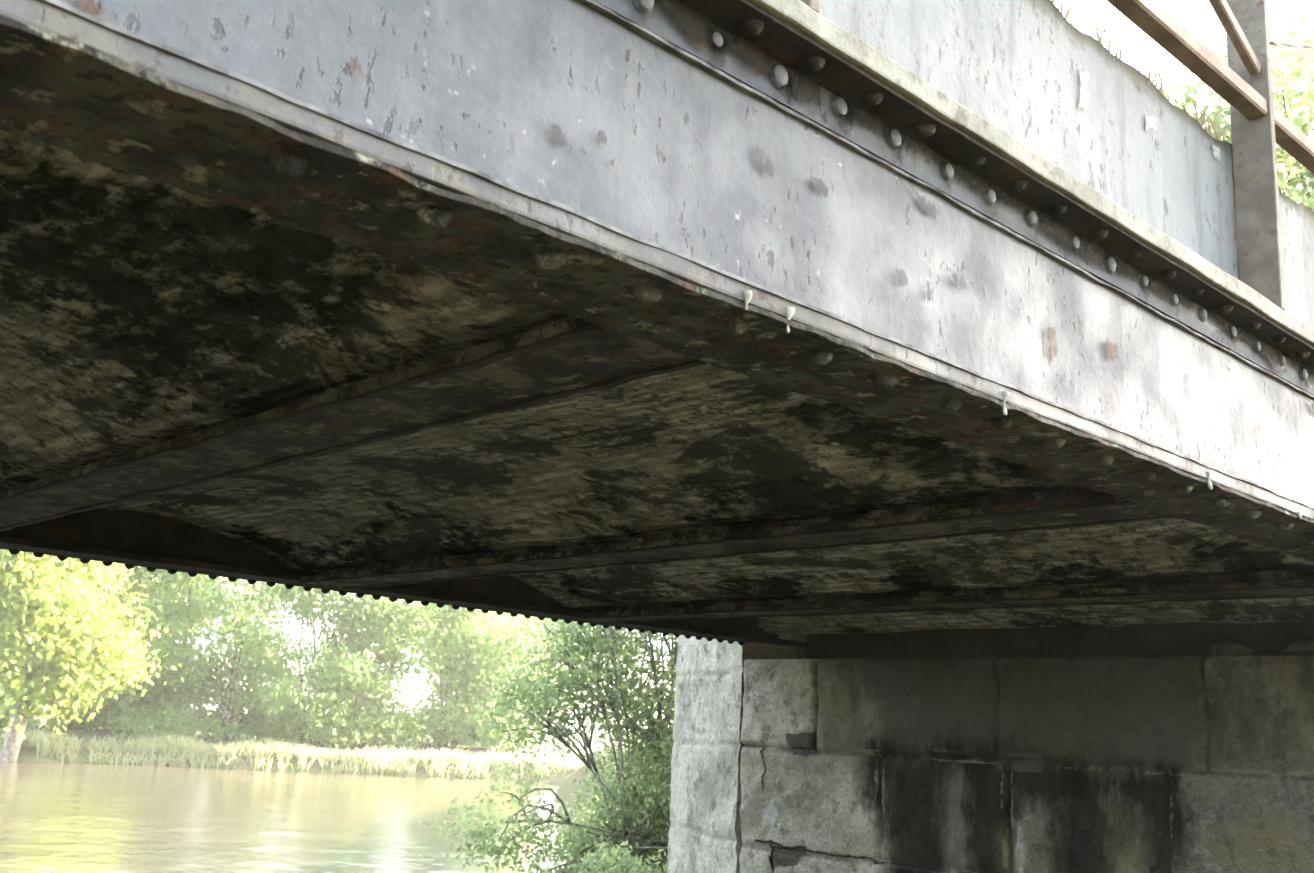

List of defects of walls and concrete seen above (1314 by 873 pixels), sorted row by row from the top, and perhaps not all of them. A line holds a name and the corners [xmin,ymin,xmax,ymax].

leakage [0,139,399,489]
leakage [660,402,1082,528]
leakage [715,571,833,602]
leakage [880,560,986,593]
leakage [1011,549,1148,587]
leakage [1181,540,1307,577]
leakage [863,741,1184,873]